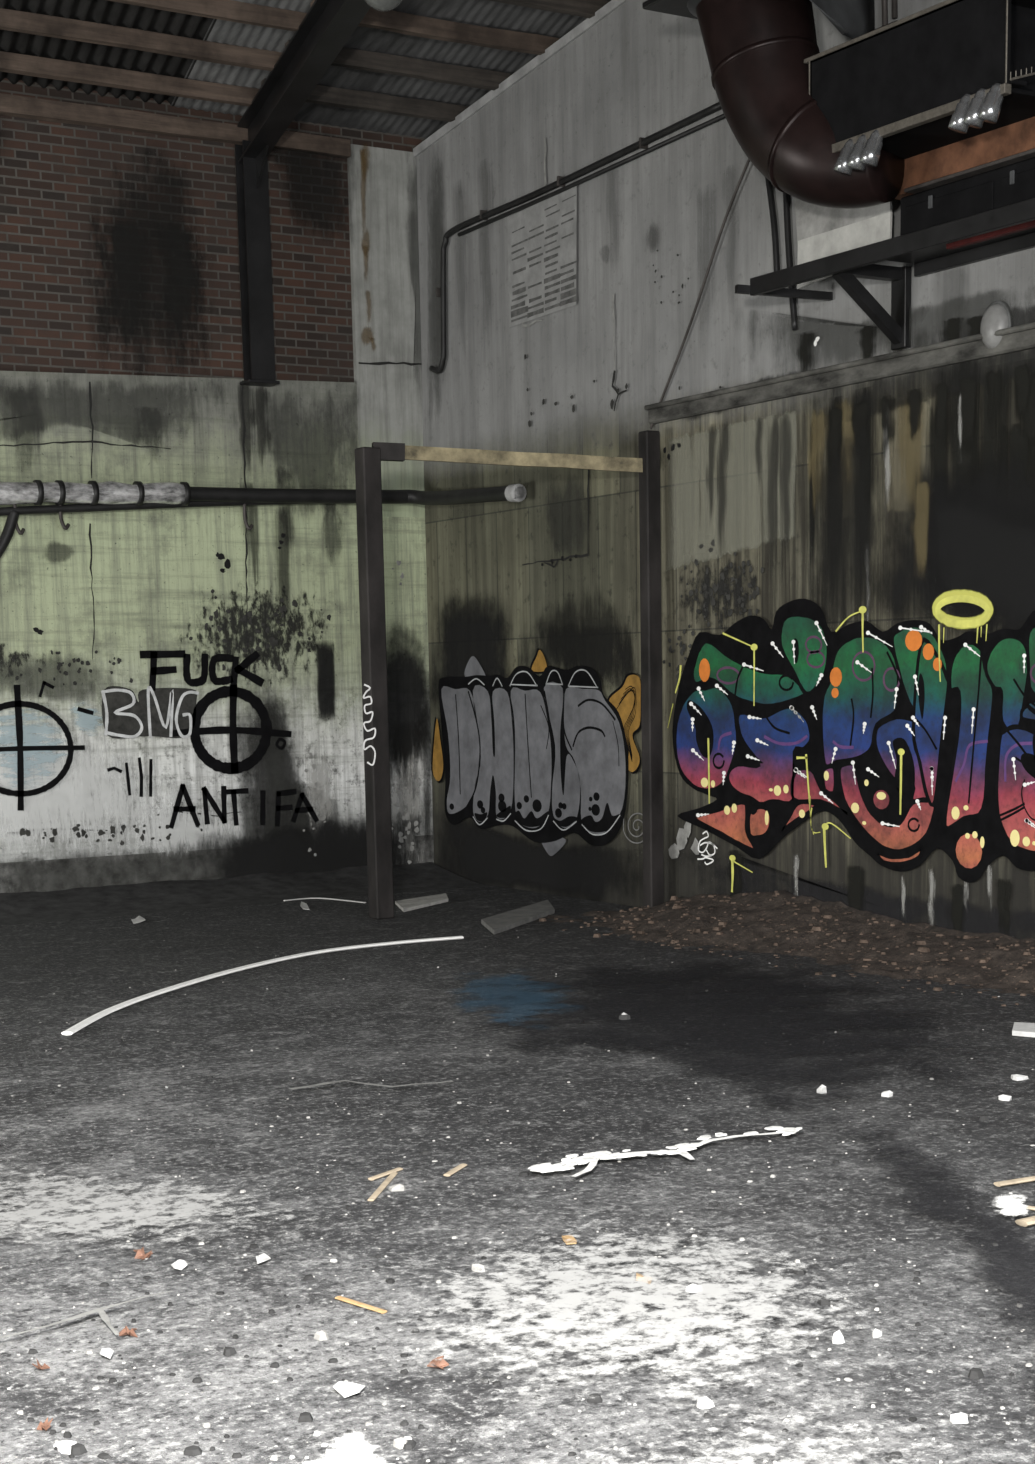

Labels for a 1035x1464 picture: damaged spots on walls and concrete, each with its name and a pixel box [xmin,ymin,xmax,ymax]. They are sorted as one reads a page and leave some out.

leakage [238,385,269,465]
corrosion [842,402,853,475]
corrosion [901,402,928,567]
leakage [246,486,258,579]
leakage [278,511,289,610]